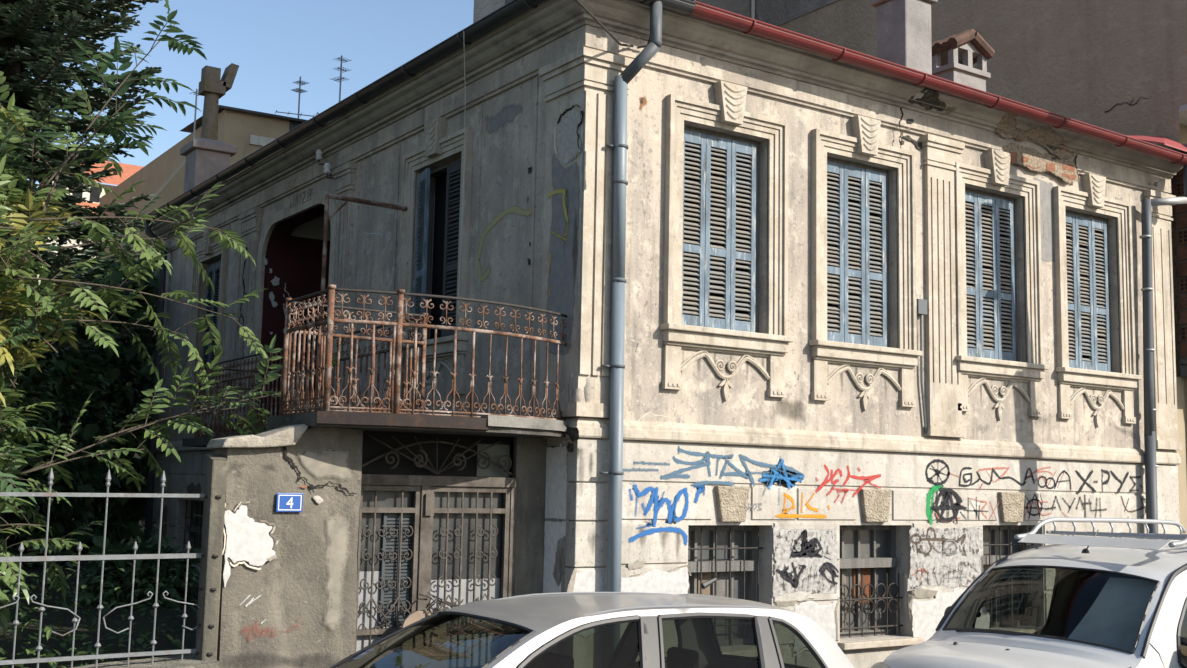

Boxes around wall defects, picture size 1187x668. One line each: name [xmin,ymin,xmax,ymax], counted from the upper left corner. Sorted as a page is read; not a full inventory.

flaking render [995,112,1080,261]
peeling [264,258,293,343]
crack [282,446,357,494]
peeling [222,501,280,587]